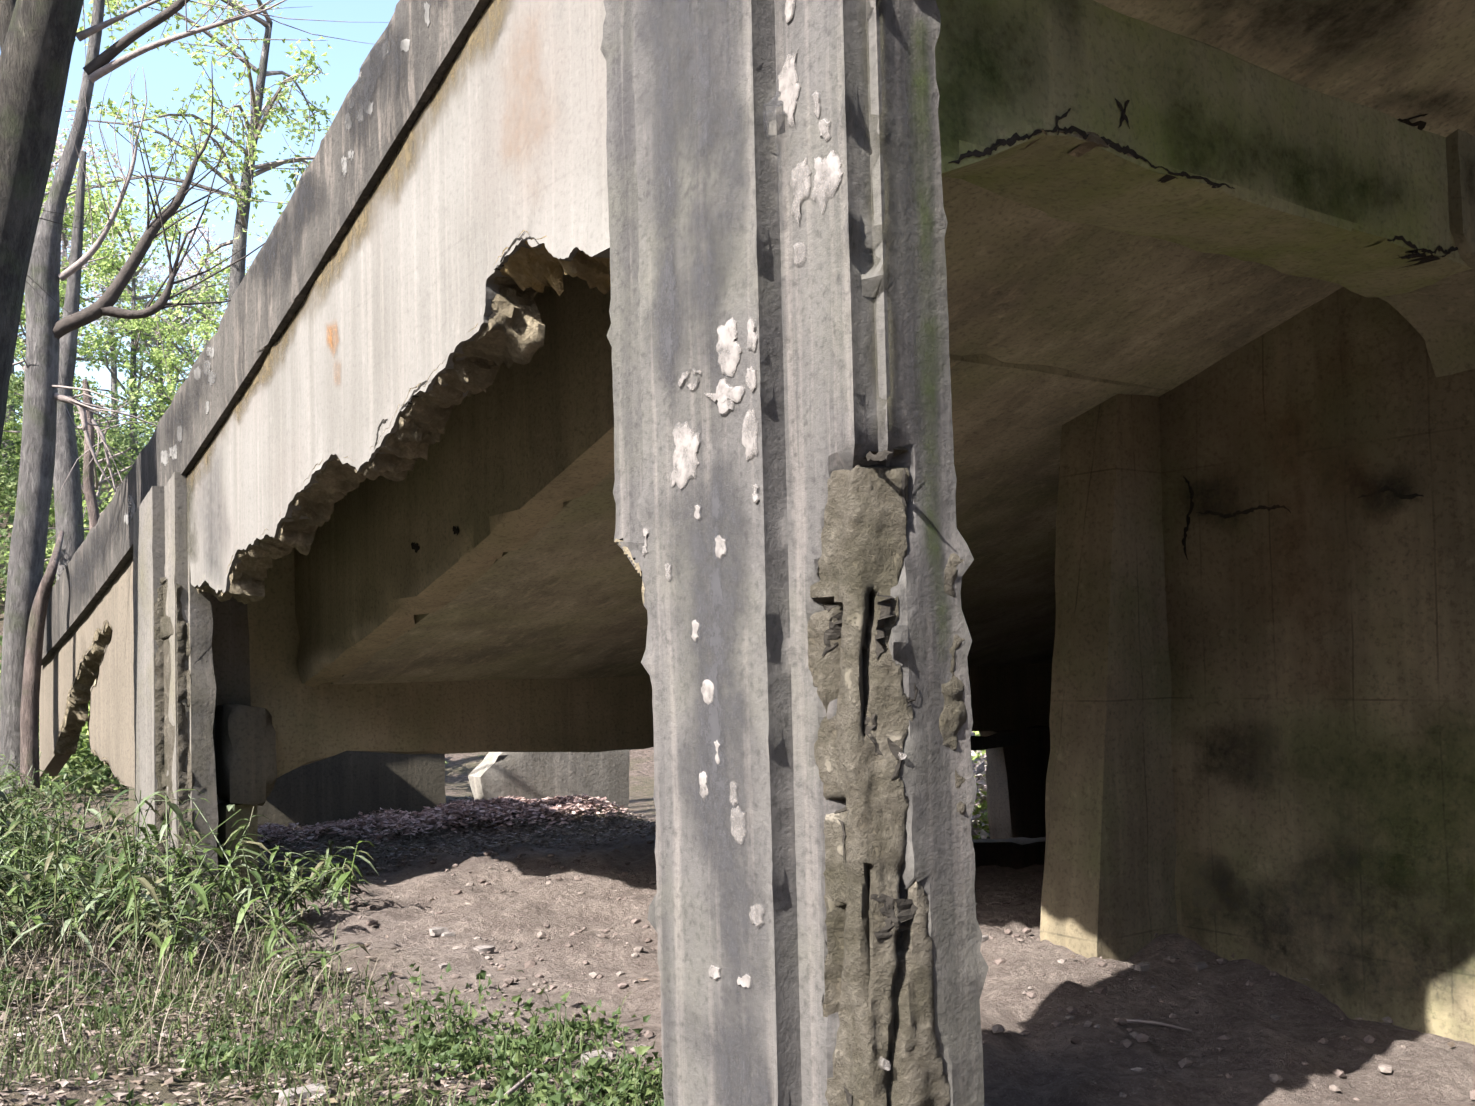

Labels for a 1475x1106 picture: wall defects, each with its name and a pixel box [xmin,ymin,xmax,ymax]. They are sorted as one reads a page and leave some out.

peeling [785,0,794,23]
water stain [1258,0,1409,54]
peeling [778,54,842,223]
crack [948,98,1235,189]
crack [1368,236,1458,269]
peeling [678,317,757,460]
peeling [670,422,700,490]
spalling [154,230,611,880]
peeling [715,536,726,559]
crack [1181,477,1291,560]
spalling [54,620,125,784]
spalling [807,446,950,1106]